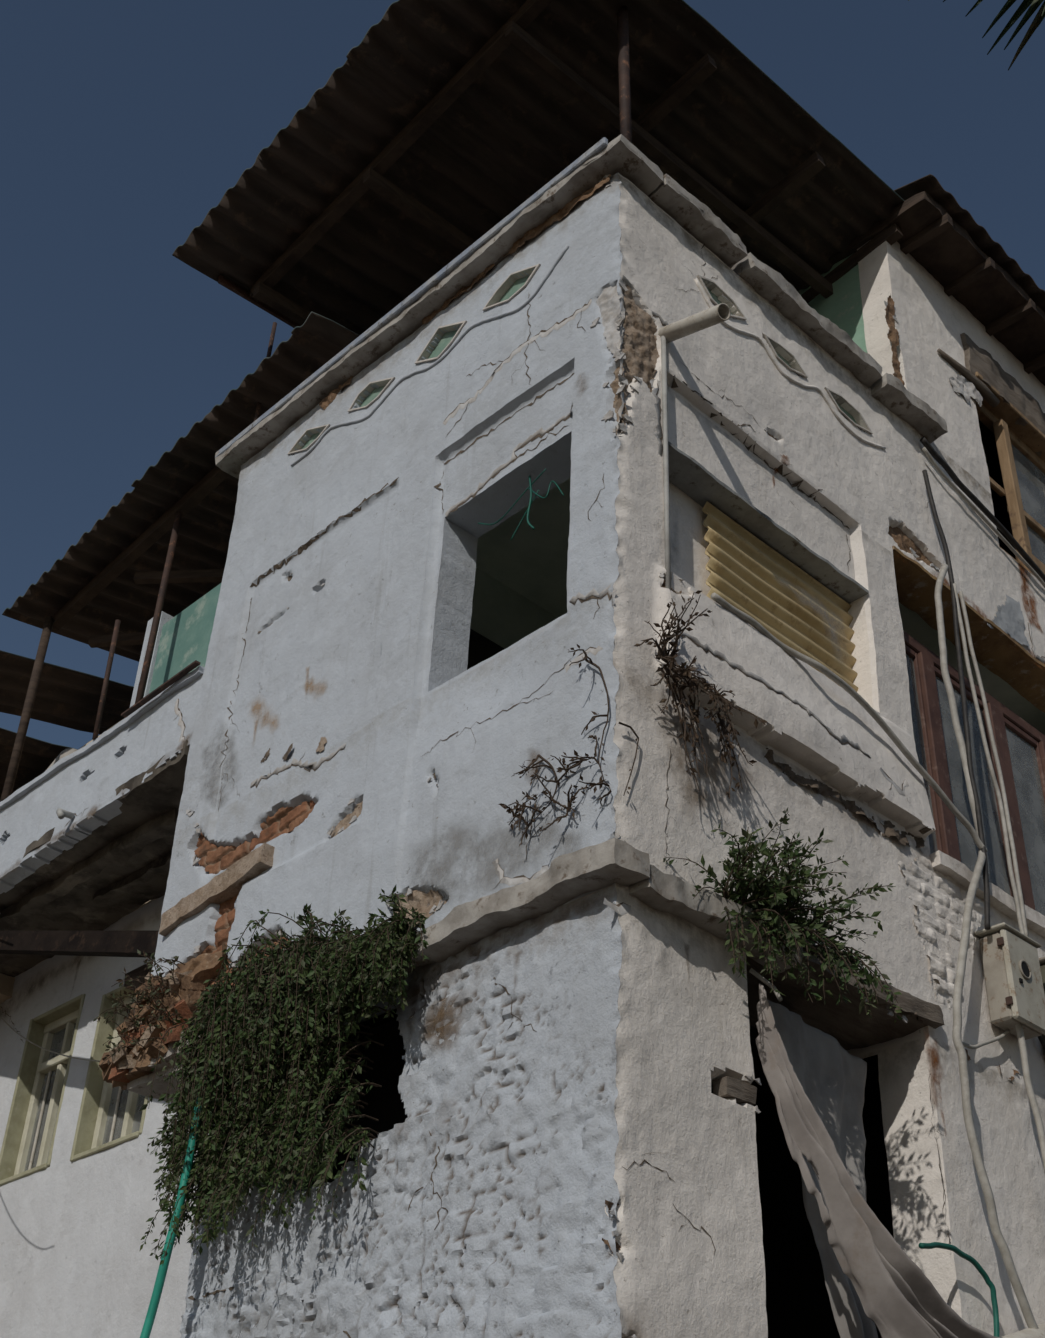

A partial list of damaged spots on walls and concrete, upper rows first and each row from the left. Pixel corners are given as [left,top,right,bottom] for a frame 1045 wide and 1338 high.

crack [434,297,592,517]
spalling [590,283,659,434]
crack [622,244,718,326]
crack [650,363,851,571]
spalling [884,295,905,385]
crack [174,699,186,742]
crack [218,477,399,811]
crack [422,586,617,756]
spalling [193,894,288,1005]
spalling [186,800,315,874]
spalling [386,888,448,927]
peeling [764,748,995,1009]